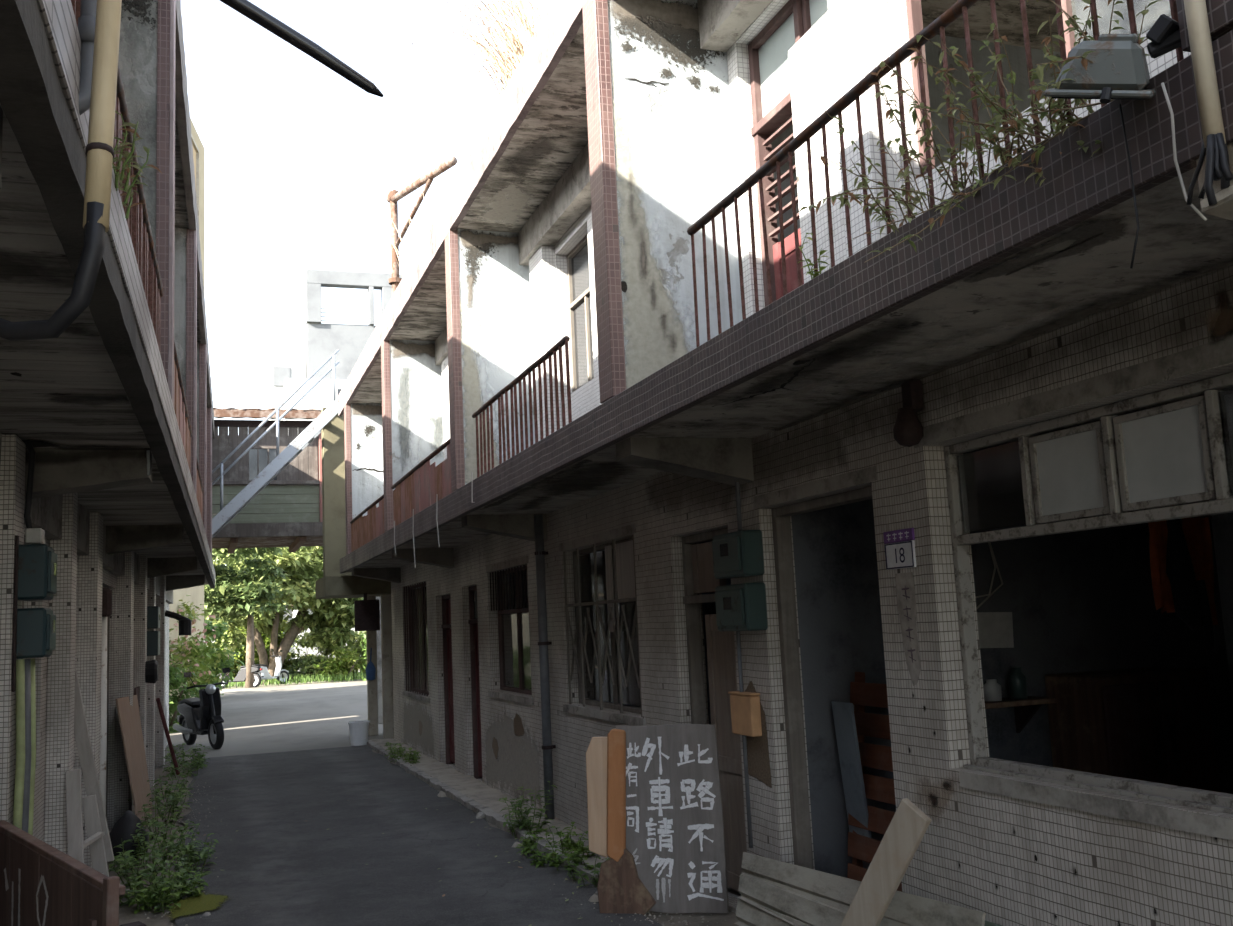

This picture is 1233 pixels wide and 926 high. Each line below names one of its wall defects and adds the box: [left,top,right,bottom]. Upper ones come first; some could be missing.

mould [121,0,157,31]
water stain [608,0,724,389]
water stain [352,403,382,451]
water stain [391,340,443,466]
water stain [457,229,518,483]
water stain [775,260,1233,431]